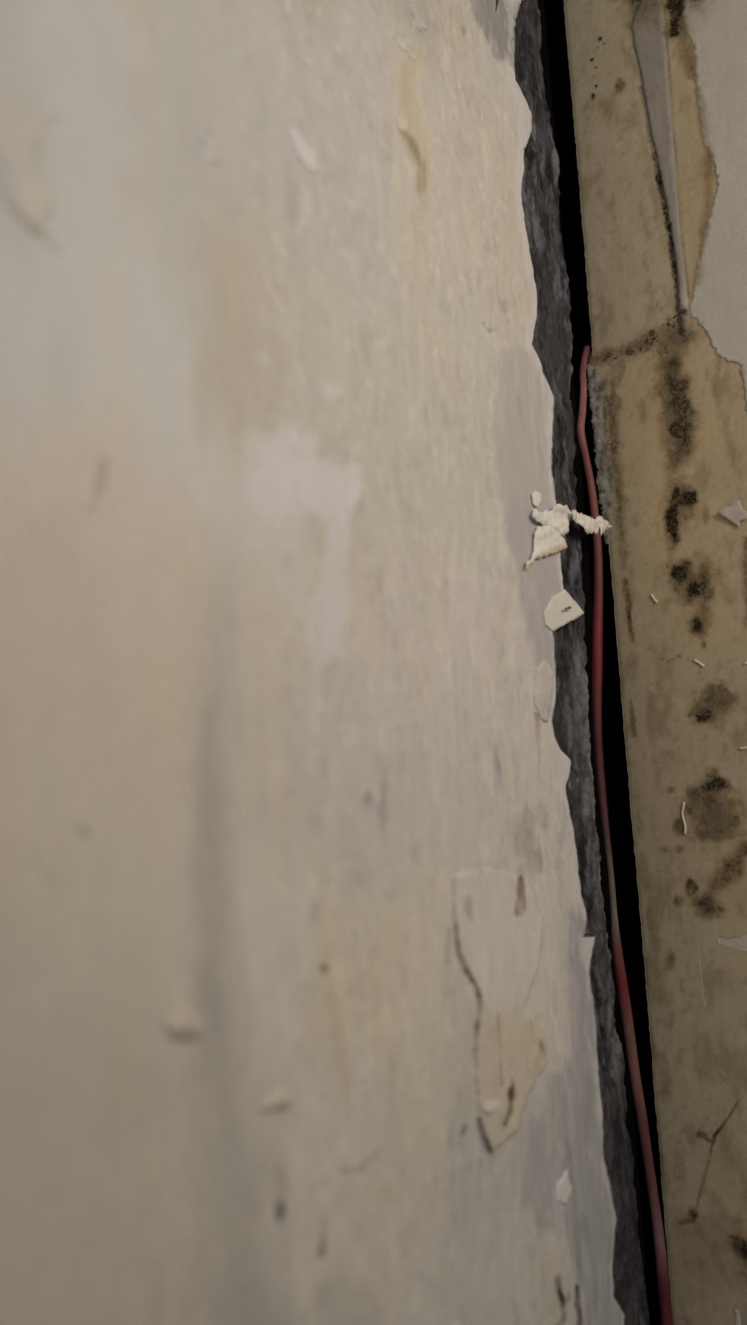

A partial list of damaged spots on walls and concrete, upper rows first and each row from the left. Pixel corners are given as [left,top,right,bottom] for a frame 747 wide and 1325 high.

leakage [626,0,704,79]
leakage [592,78,720,647]
spalling [450,0,671,1325]
leakage [687,680,736,728]
leakage [662,769,747,918]
leakage [730,1235,747,1278]